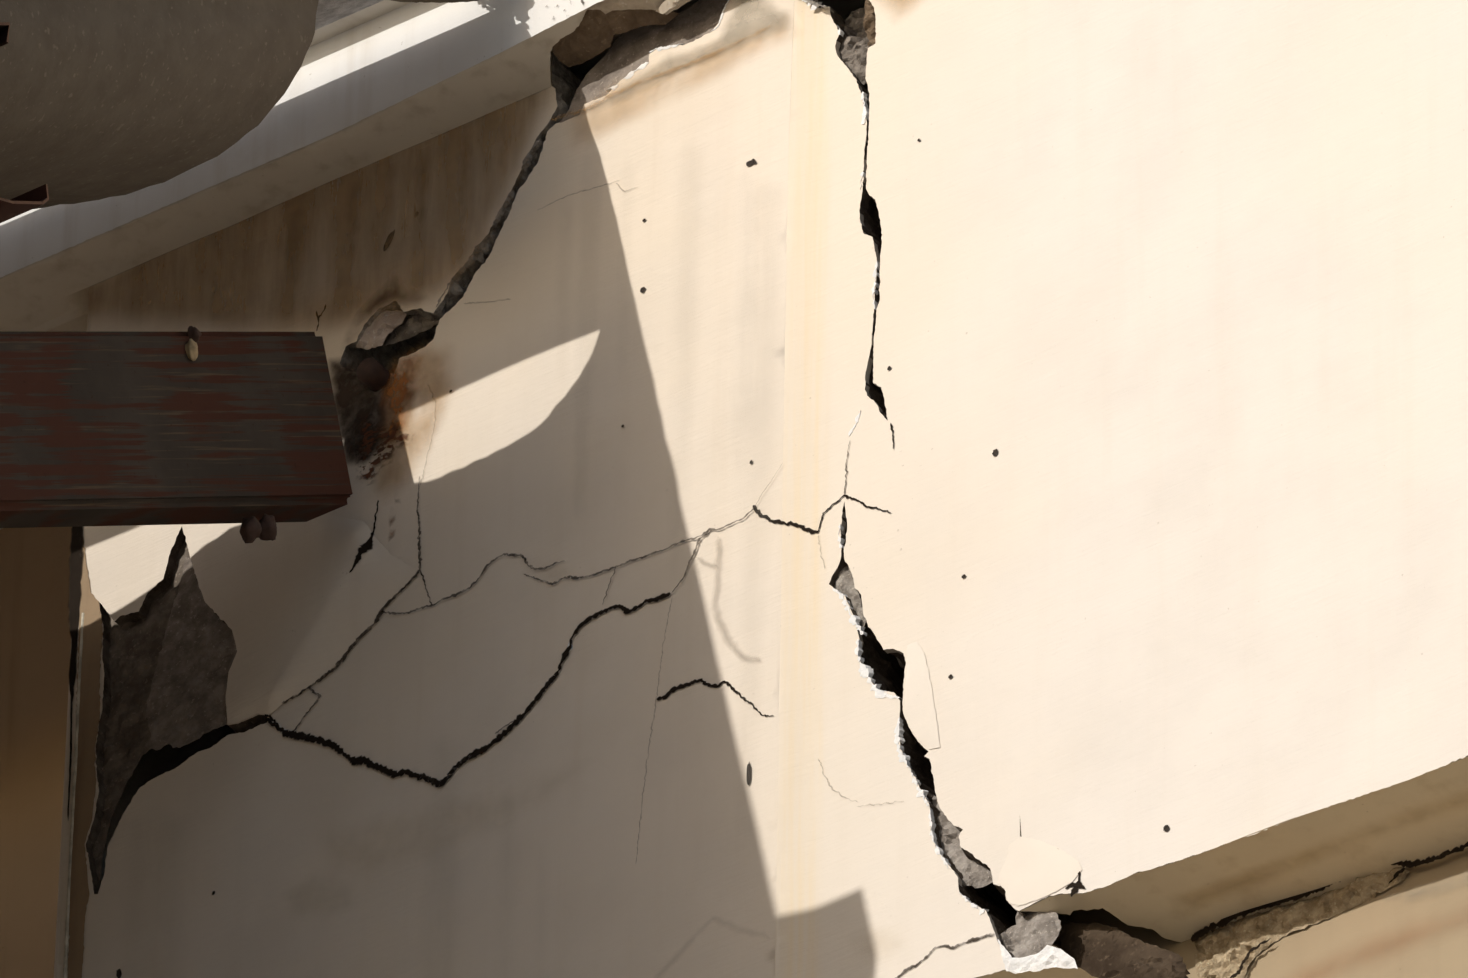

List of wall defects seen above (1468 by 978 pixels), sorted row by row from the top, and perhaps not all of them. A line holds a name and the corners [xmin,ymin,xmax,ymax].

spalling [552,0,729,123]
spalling [802,0,827,11]
spalling [861,92,869,125]
crack [316,55,582,374]
crack [789,0,894,449]
spalling [871,261,880,310]
corrosion [331,359,413,479]
spalling [67,527,267,978]
crack [265,442,1341,978]
spalling [1195,867,1410,978]
crack [1388,842,1468,884]